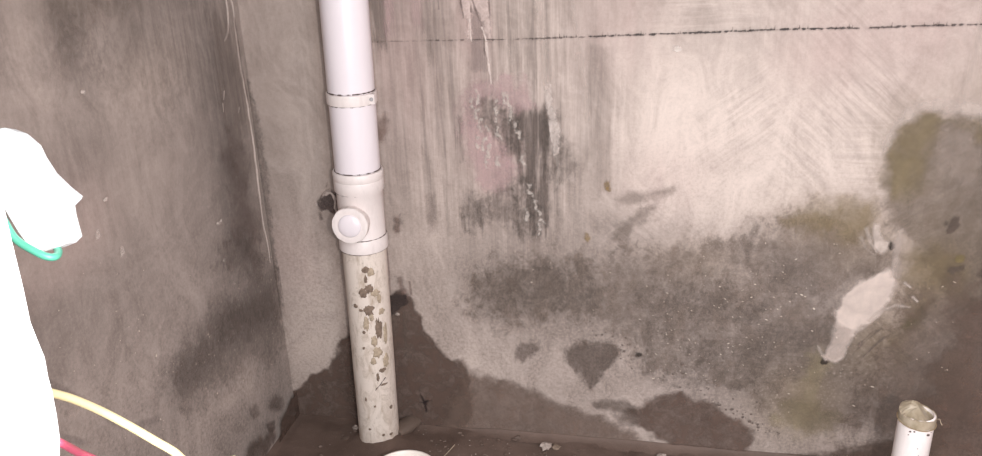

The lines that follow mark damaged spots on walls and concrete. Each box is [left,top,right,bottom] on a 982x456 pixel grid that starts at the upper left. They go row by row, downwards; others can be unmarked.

damp [511,83,559,229]
damp [248,329,358,456]
damp [391,290,752,451]
peeling [820,269,918,364]
damp [811,104,982,456]